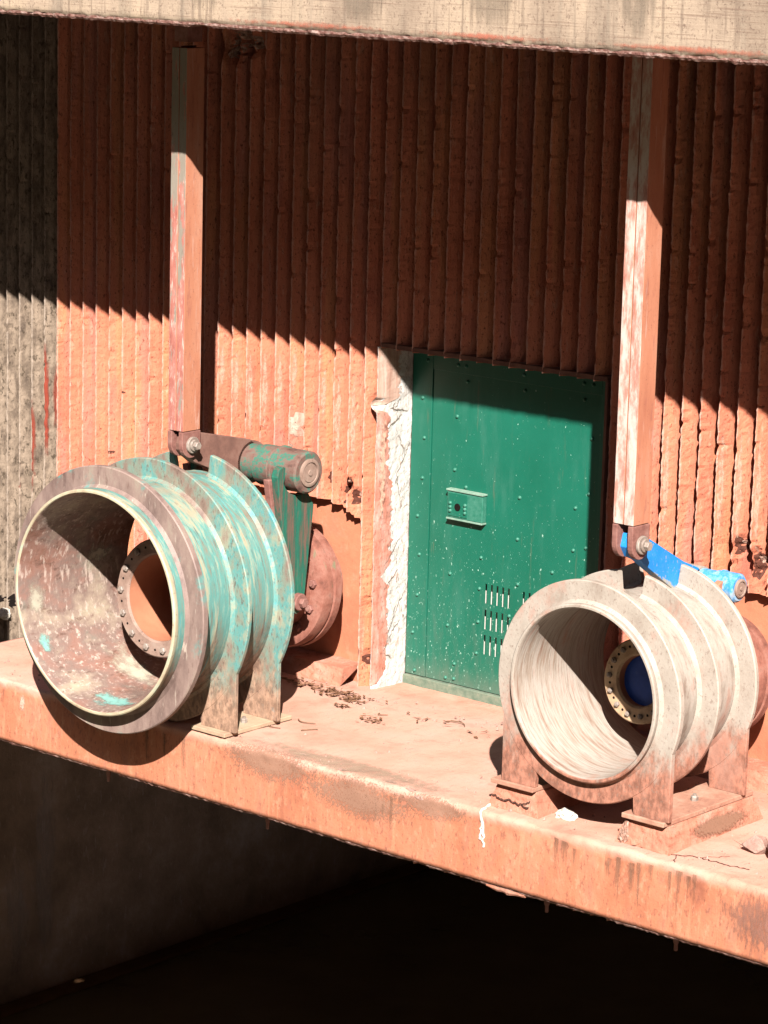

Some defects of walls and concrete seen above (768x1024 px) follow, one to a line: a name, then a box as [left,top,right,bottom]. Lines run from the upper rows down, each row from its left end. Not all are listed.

corrosion [623,44,760,55]
corrosion [31,350,57,481]
peeling [219,349,304,447]
peeling [320,371,356,462]
spalling [343,478,362,504]
peeling [362,348,403,686]
peeling [662,427,670,522]
peeling [717,437,768,580]
water stain [478,803,491,847]
crack [492,794,530,809]
crack [671,854,749,870]